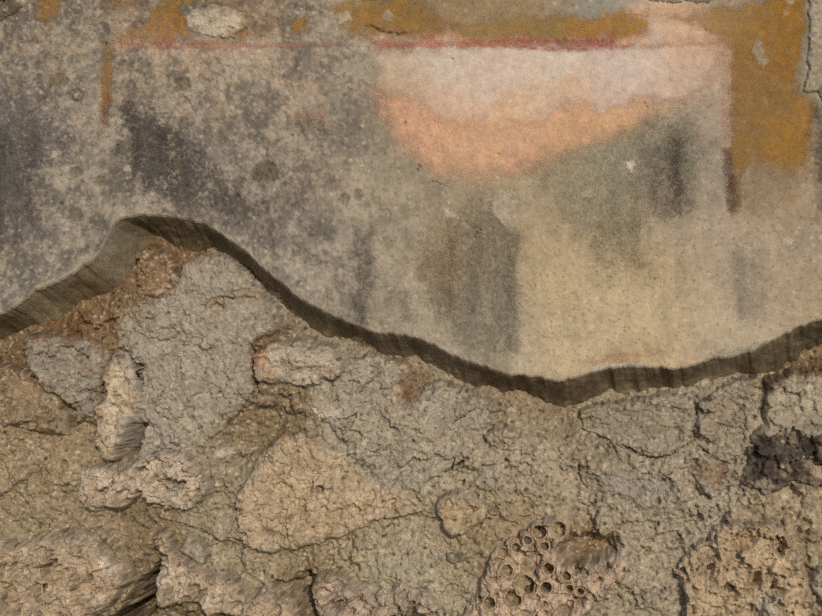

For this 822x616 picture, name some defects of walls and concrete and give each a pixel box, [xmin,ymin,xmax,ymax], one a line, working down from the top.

flaking render [187,5,246,40]
leakage [120,100,269,223]
spalling [0,215,822,409]
crack [204,344,263,443]
crack [622,402,730,464]